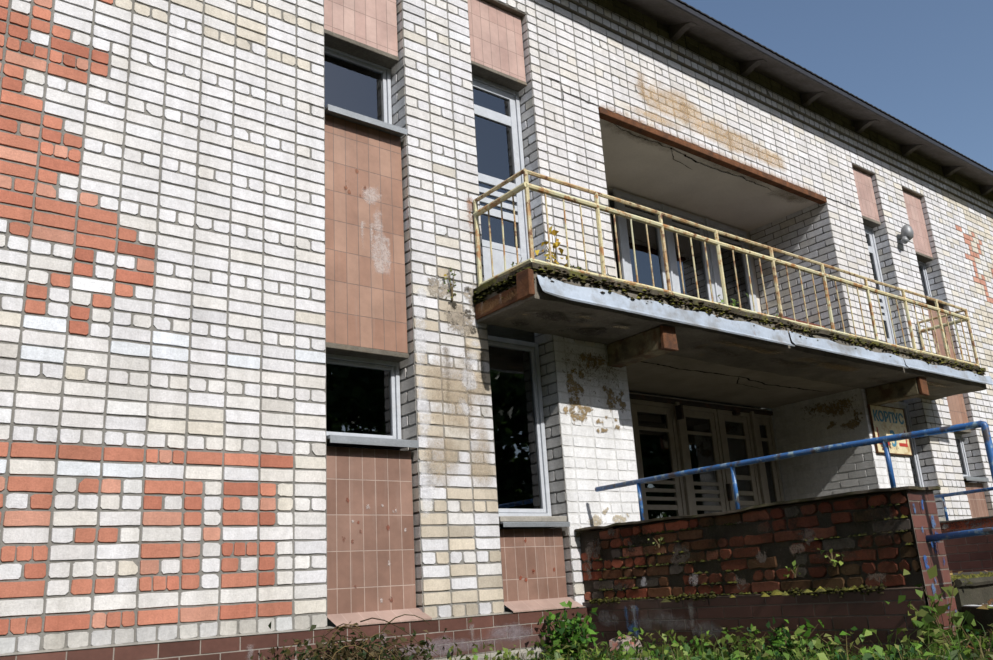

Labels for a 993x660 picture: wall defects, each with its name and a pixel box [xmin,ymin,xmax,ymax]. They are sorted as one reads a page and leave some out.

damp [640,82,751,150]
damp [419,369,480,433]
peeling [563,350,626,433]